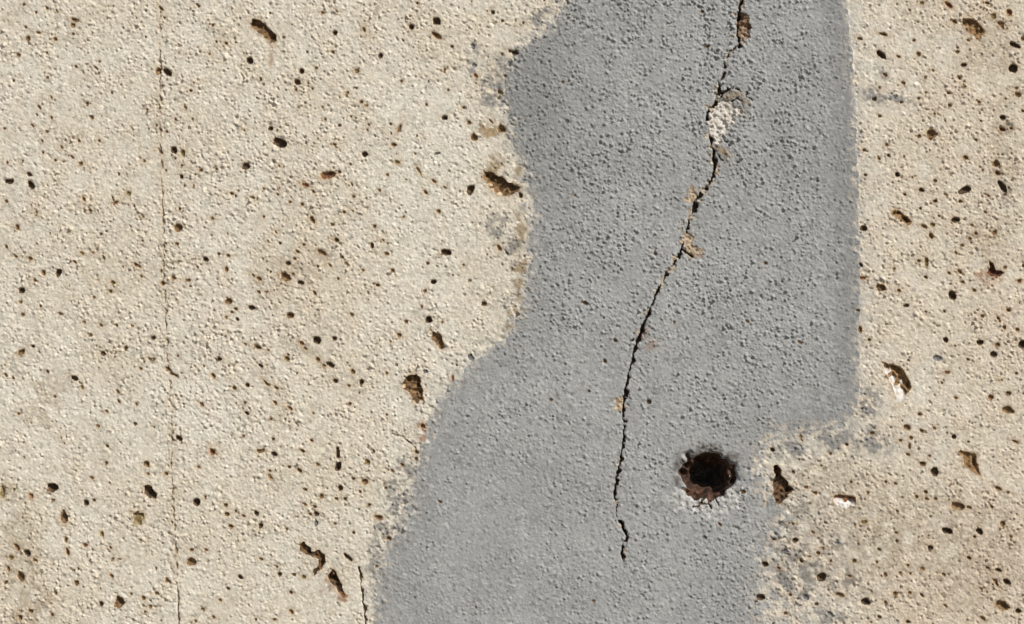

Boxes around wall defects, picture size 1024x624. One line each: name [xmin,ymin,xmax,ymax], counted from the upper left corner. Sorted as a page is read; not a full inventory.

crack [613,0,753,560]
spalling [705,93,744,144]